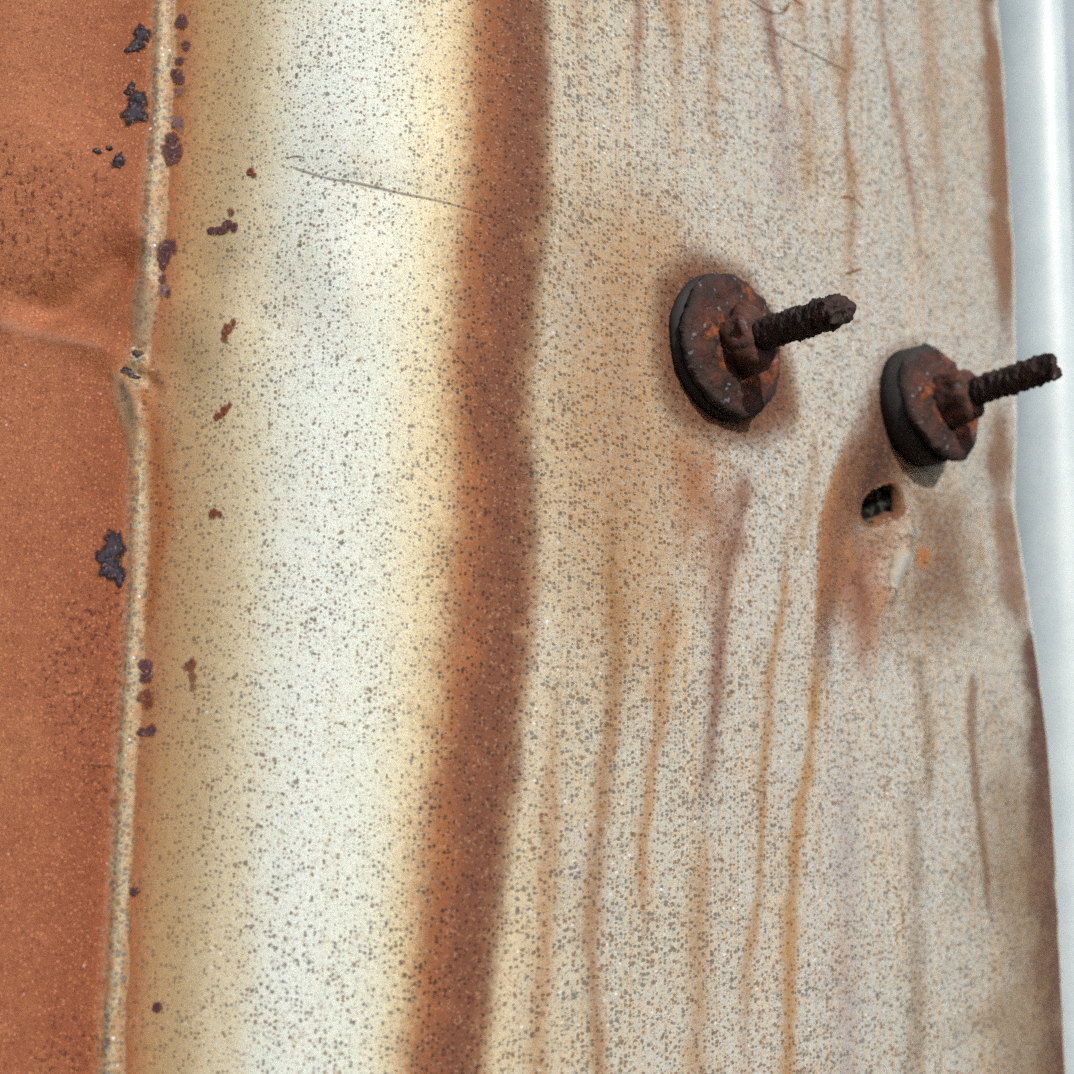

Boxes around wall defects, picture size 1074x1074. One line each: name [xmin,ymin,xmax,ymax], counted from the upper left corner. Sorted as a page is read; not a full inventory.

corrosion [92,145,126,168]
corrosion [980,0,1013,313]
corrosion [95,528,128,588]
peeling [112,372,137,450]
corrosion [401,0,553,1074]
corrosion [569,218,795,749]
corrosion [816,380,972,656]
corrosion [989,415,1009,486]
corrosion [995,505,1022,616]
corrosion [638,612,675,895]
corrosion [783,758,813,1074]
corrosion [1022,634,1065,1074]